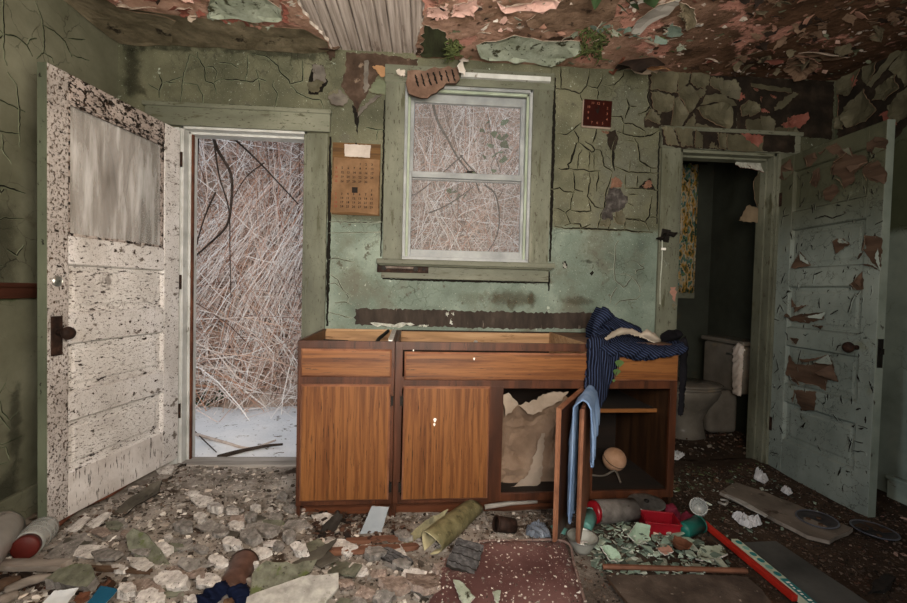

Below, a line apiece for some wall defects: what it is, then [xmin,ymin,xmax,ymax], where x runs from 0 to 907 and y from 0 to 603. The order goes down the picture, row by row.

crack [0,0,89,194]
crack [148,52,324,109]
peeling [64,0,907,227]
crack [366,66,667,306]